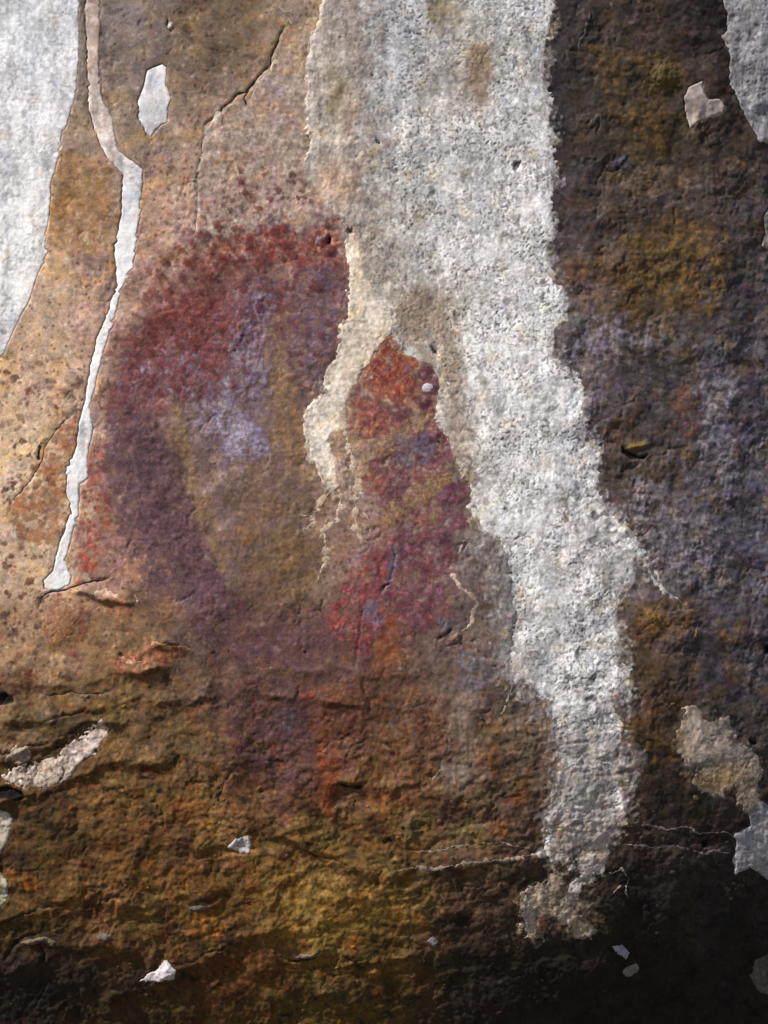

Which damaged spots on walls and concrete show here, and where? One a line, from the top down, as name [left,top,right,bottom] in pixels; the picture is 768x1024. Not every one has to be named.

flaking render [0,0,80,357]
peeling [138,65,171,137]
crack [194,28,284,233]
peeling [684,81,725,129]
spalling [722,0,768,144]
rust [353,286,477,524]
spalling [1,719,109,789]
peeling [227,835,251,854]
peeling [671,705,768,880]
peeling [140,960,176,982]